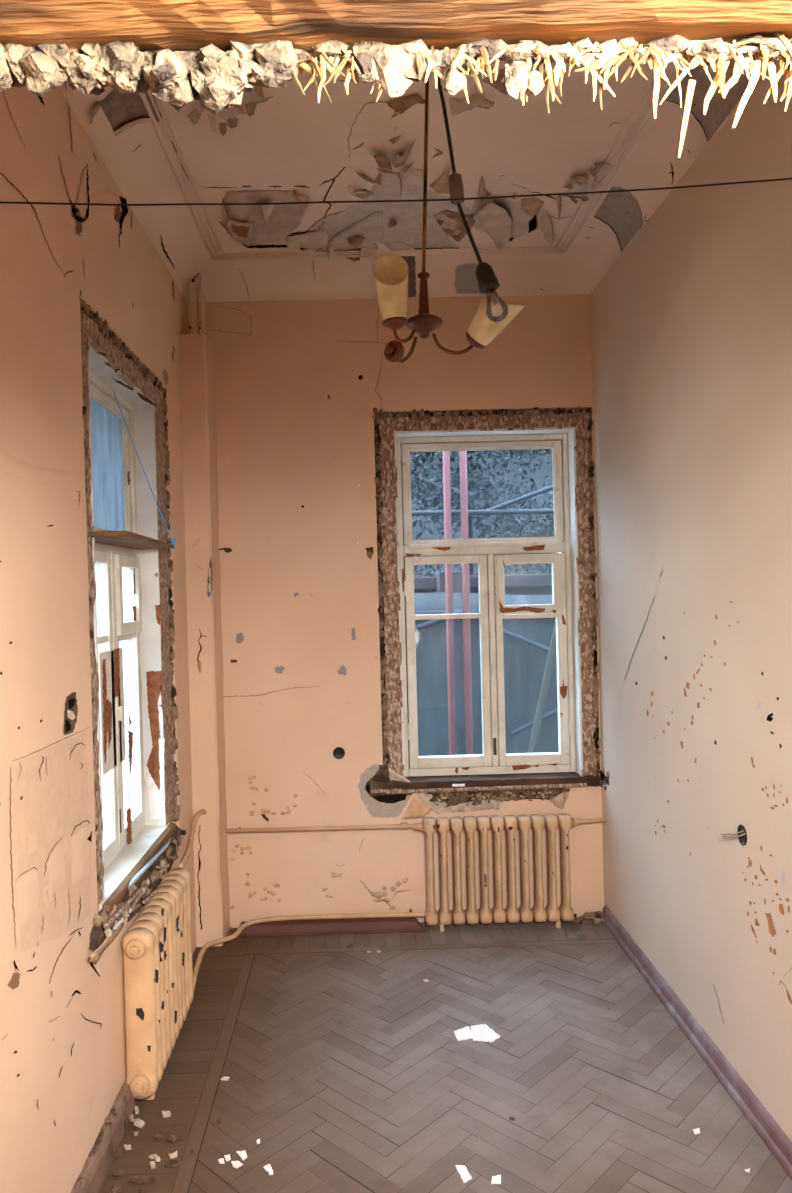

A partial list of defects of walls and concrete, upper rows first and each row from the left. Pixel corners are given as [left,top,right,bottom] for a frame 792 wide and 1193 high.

crack [38,81,97,161]
spalling [0,33,792,141]
crack [0,173,85,280]
peeling [218,136,644,297]
spalling [357,406,610,820]
spalling [680,640,726,763]
spalling [743,846,790,955]